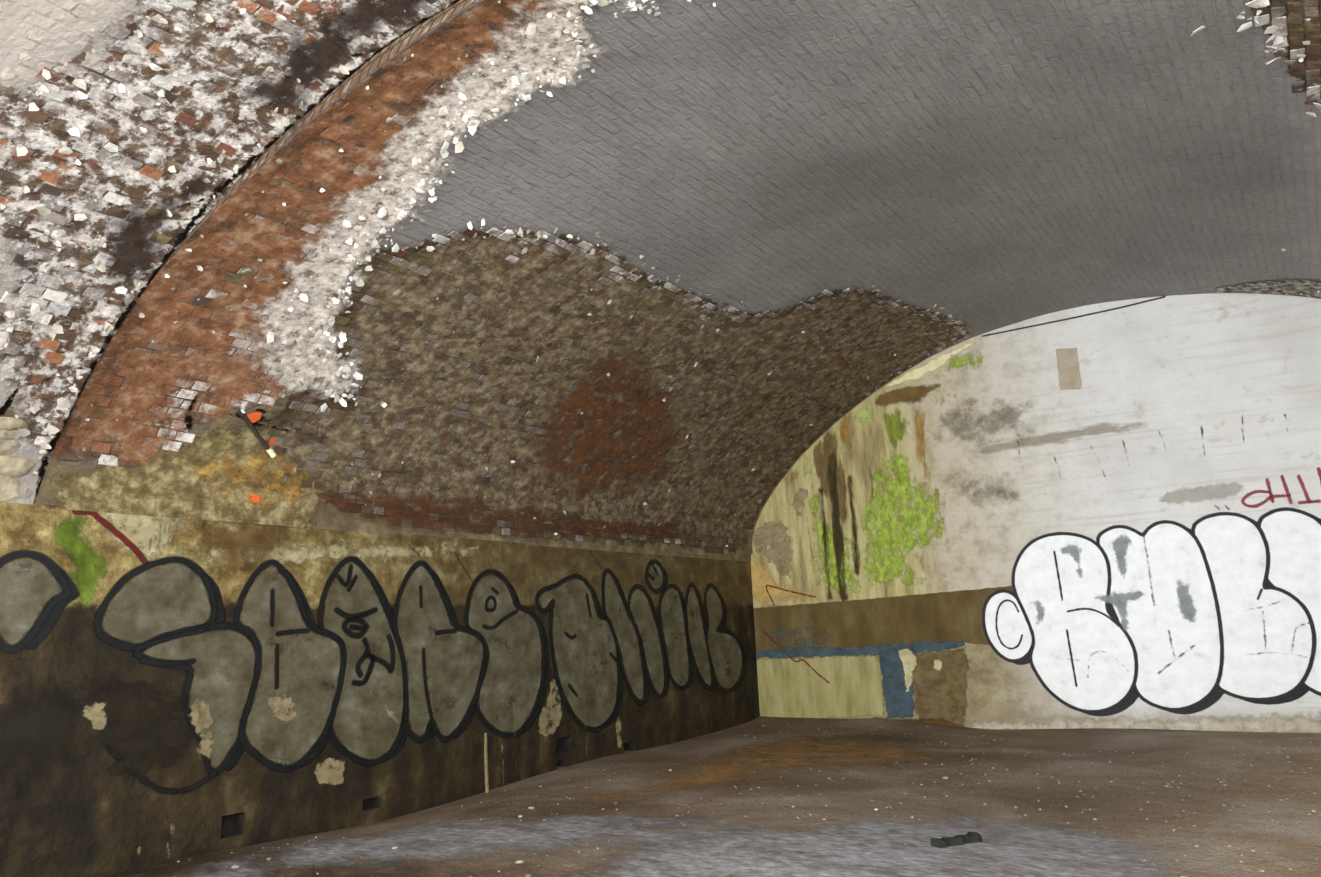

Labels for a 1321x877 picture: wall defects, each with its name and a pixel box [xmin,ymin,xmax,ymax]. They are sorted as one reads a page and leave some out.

spalling [1236,0,1321,117]
spalling [0,0,971,576]
spalling [1214,280,1321,299]
water stain [813,432,860,601]
peeling [898,649,917,692]